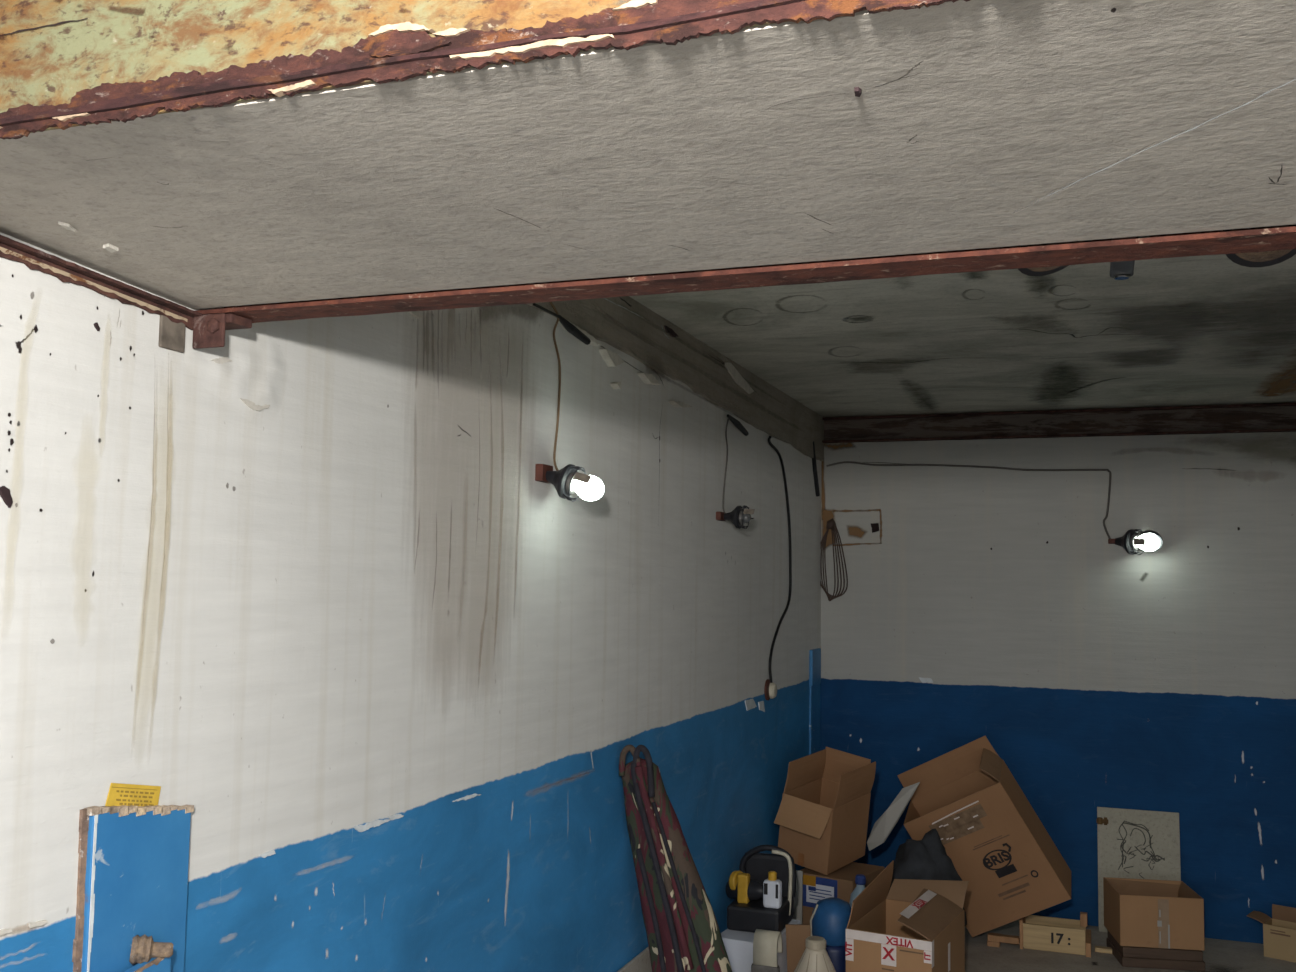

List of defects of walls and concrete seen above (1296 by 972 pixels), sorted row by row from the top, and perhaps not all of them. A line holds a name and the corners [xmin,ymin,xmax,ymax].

peeling [612,0,658,11]
peeling [367,22,471,37]
peeling [449,34,615,60]
rust [0,0,970,140]
peeling [268,80,317,97]
peeling [52,113,91,121]